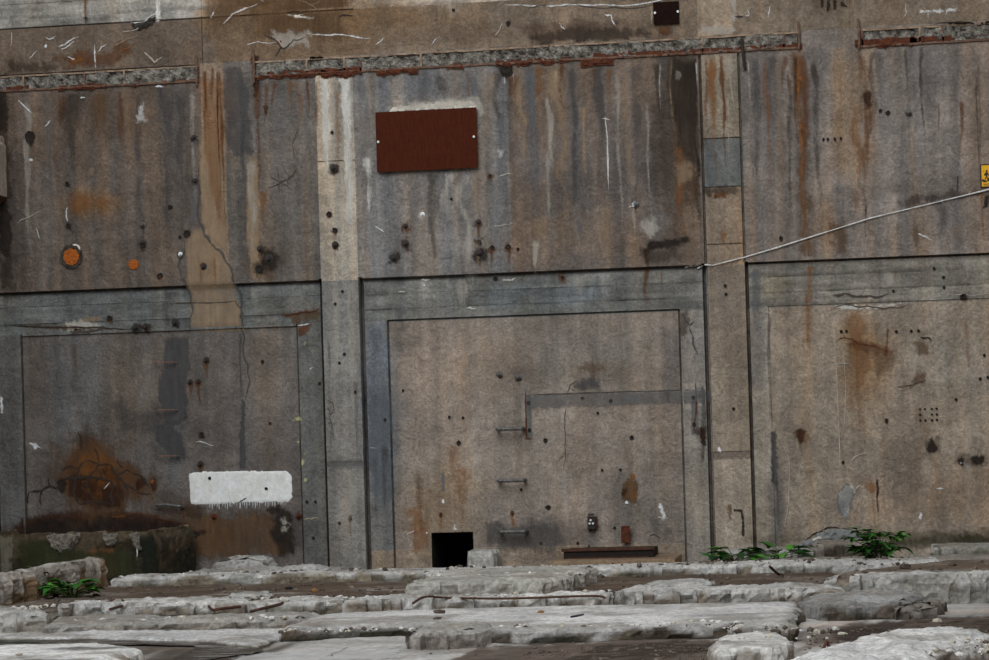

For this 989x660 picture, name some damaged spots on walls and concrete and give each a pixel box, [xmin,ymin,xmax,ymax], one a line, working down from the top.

rust [494,43,806,128]
damp [655,60,700,178]
crack [177,301,243,328]
crack [285,308,319,336]
rust [56,436,156,516]